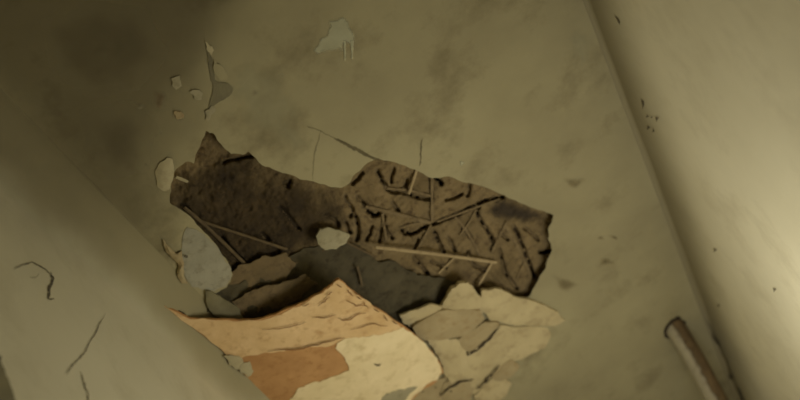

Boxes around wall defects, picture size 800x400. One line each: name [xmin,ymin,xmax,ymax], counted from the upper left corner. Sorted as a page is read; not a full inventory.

peeling [190,42,233,121]
crack [337,139,378,160]
crack [16,261,54,300]
spalling [155,131,566,400]
crack [67,319,103,400]